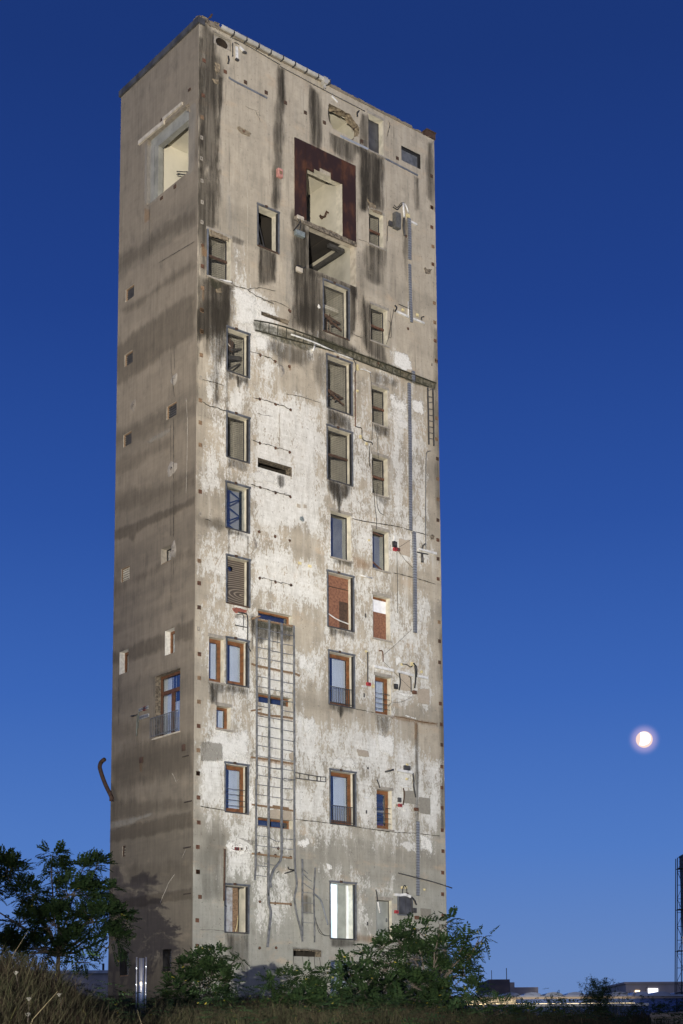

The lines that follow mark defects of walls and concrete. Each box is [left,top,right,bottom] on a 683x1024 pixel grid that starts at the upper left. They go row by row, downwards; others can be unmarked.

spalling [327,102,360,147]
damp [198,26,222,262]
damp [338,115,383,211]
peeling [216,286,290,324]
peeling [376,351,412,371]
peeling [390,394,424,429]
damp [328,480,349,510]
peeling [232,607,250,640]
peeling [201,729,250,764]
peeling [331,734,394,769]
peeling [403,791,430,814]
peeling [398,835,432,853]